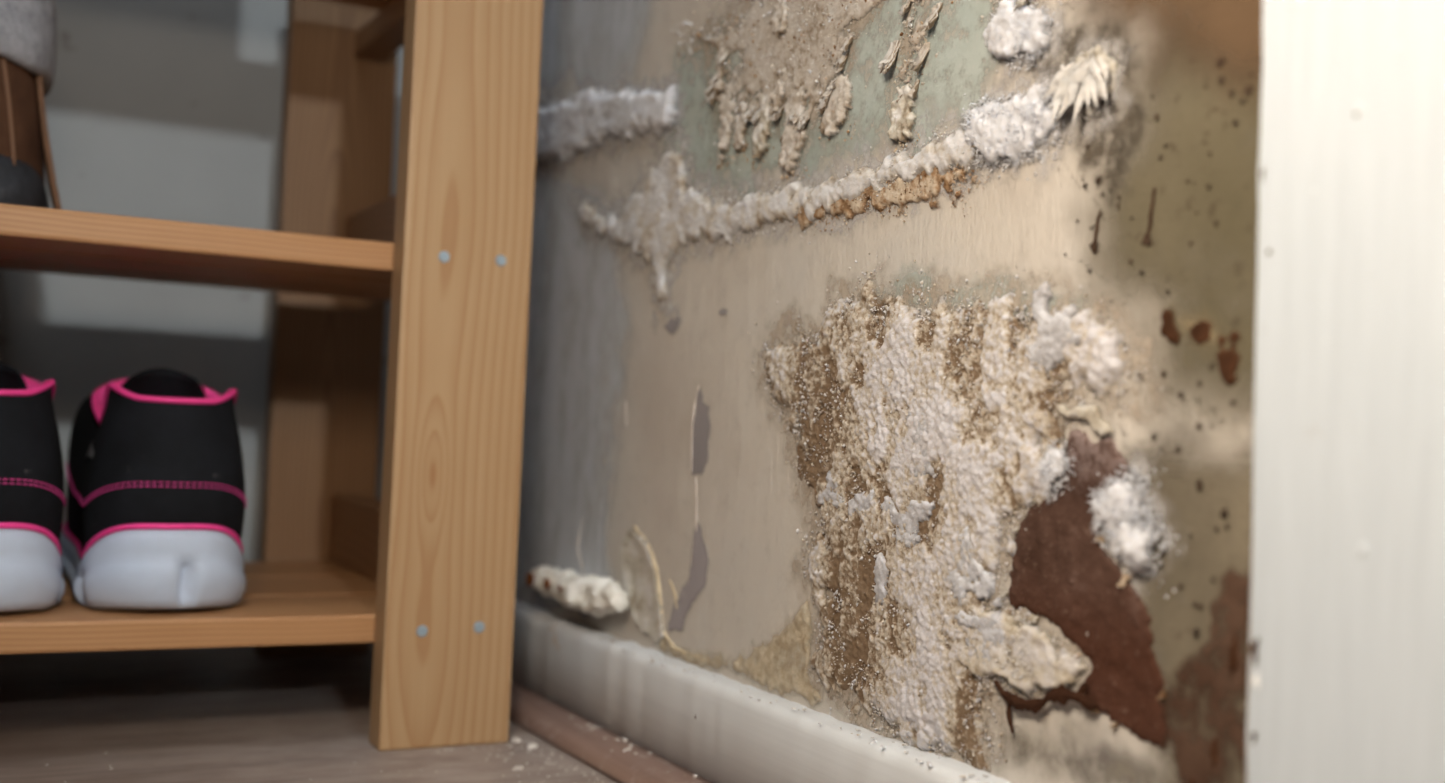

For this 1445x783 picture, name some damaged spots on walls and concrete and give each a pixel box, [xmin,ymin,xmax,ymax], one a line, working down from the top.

peeling [667,0,953,181]
peeling [980,0,1037,22]
water stain [515,0,1263,783]
spalling [954,405,1169,750]